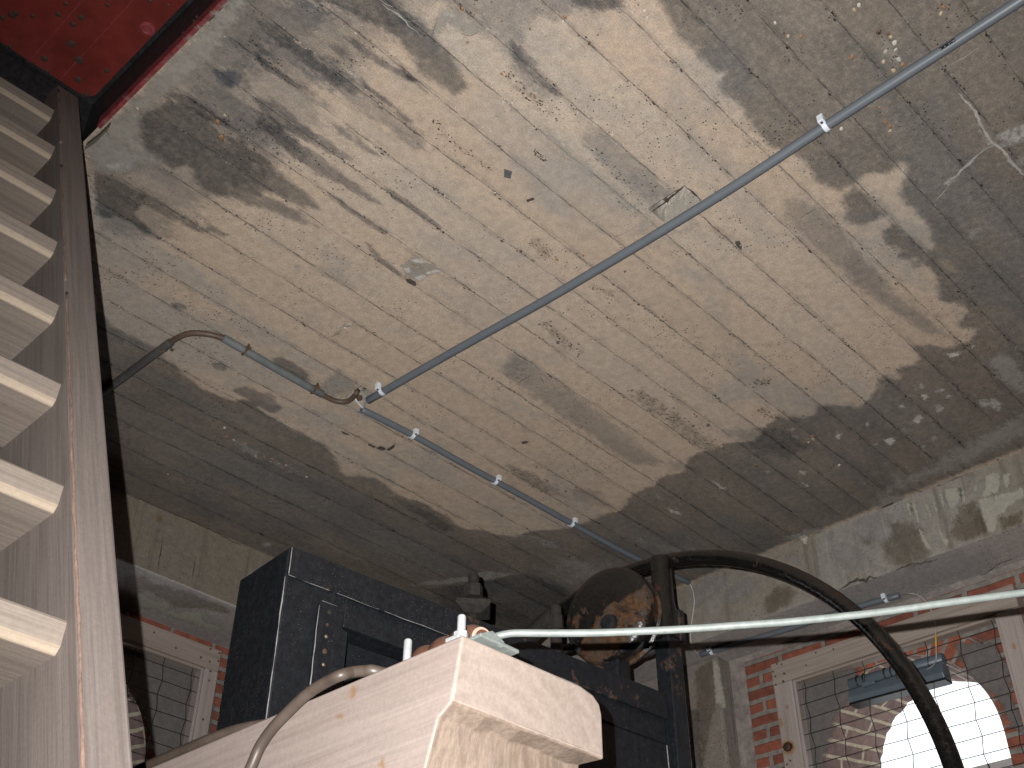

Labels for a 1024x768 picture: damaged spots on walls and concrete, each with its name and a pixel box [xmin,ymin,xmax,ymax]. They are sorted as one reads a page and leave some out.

crack [935,93,1024,202]
spalling [648,185,701,223]
damp [985,347,1024,394]
damp [872,399,1024,551]
damp [413,571,511,585]